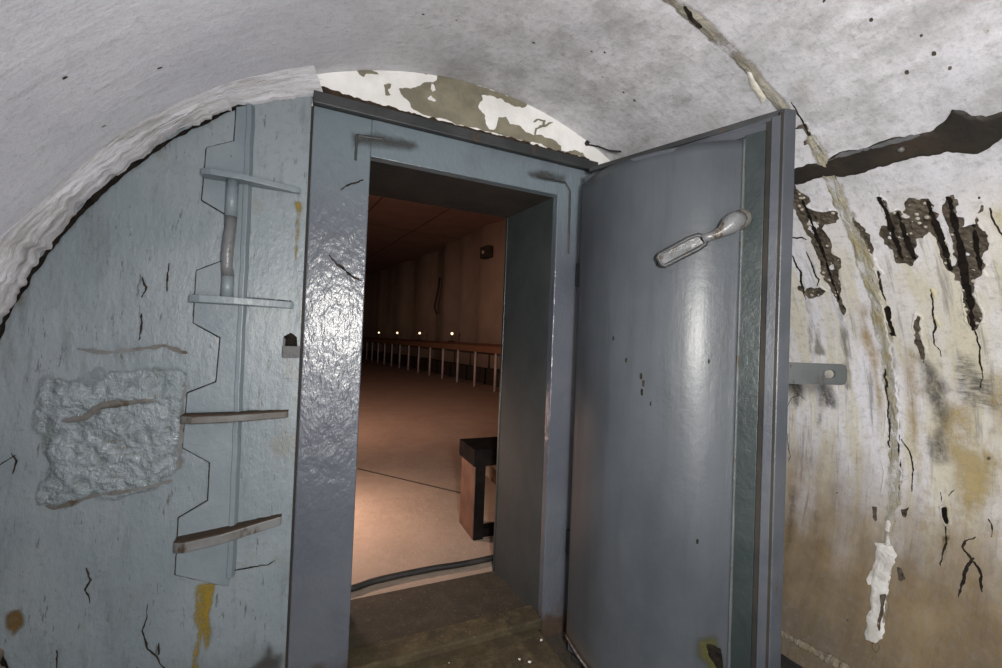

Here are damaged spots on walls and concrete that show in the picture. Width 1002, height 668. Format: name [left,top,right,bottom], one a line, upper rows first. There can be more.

peeling [358,70,585,157]
rust [0,105,246,339]
crack [792,237,820,300]
spalling [793,184,846,315]
spalling [852,193,991,336]
crack [989,208,1002,235]
crack [930,287,941,355]
damp [822,387,835,406]
damp [925,363,988,503]
rust [174,514,282,543]
crack [939,519,993,597]
rust [192,584,214,668]